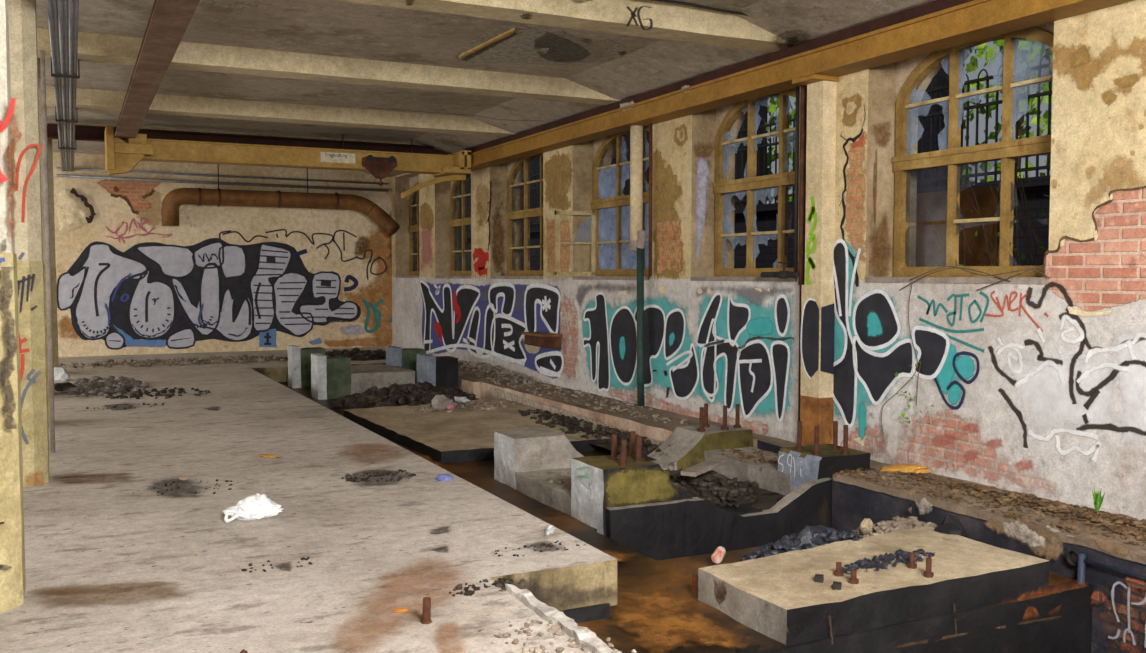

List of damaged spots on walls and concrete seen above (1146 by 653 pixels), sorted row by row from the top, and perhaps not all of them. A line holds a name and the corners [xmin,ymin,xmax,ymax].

damp [1052,37,1146,106]
flaking render [98,180,161,214]
rust [325,230,393,347]
peeling [648,150,685,294]
crack [839,106,865,287]
flaking render [845,131,867,261]
flaking render [1043,186,1146,317]
flaking render [840,407,1059,498]
rust [619,586,737,647]